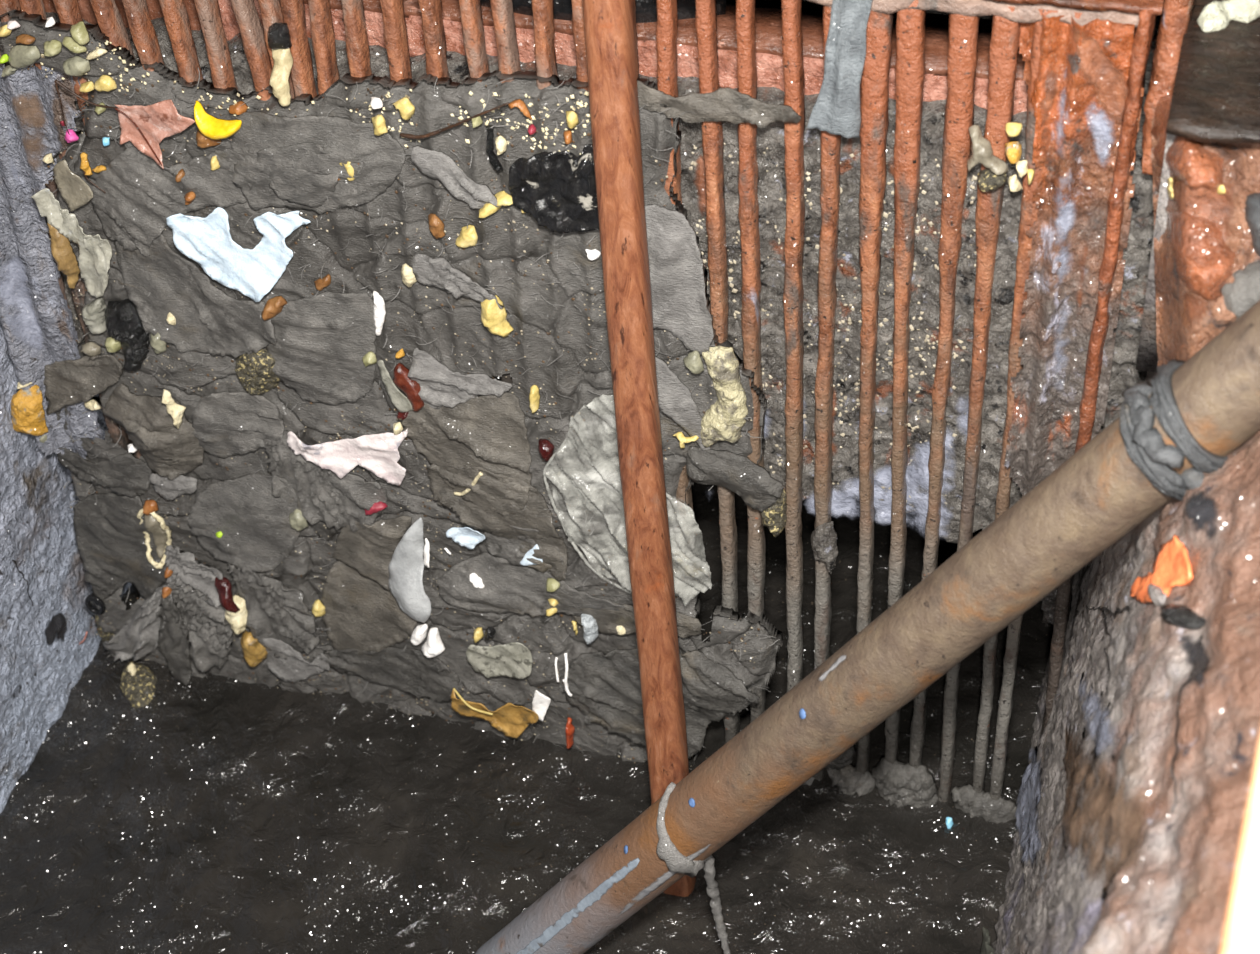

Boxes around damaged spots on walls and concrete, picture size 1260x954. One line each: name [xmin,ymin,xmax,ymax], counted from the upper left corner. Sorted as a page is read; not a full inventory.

corrosion [1004,13,1144,496]
corrosion [1040,587,1058,627]